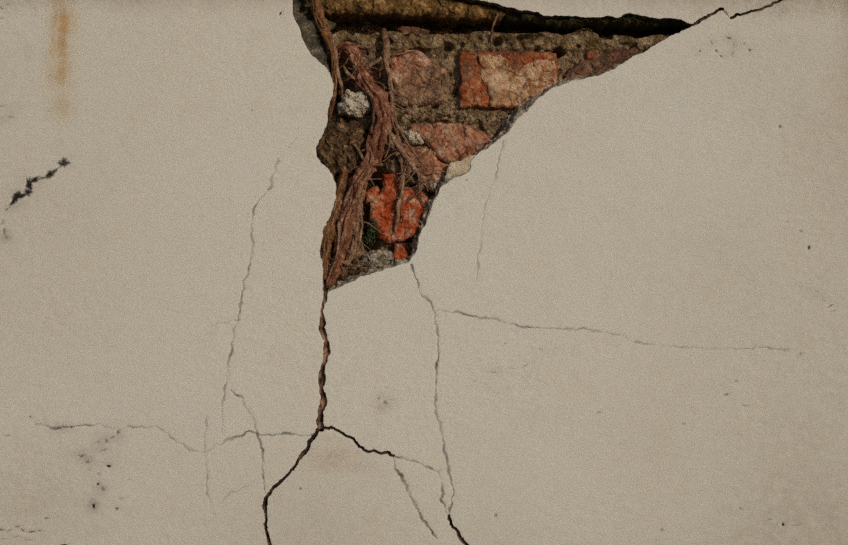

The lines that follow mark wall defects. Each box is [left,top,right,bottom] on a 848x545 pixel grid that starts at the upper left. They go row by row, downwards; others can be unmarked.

crack [688,0,783,27]
spalling [292,0,691,294]
crack [262,292,403,545]
crack [419,489,469,545]